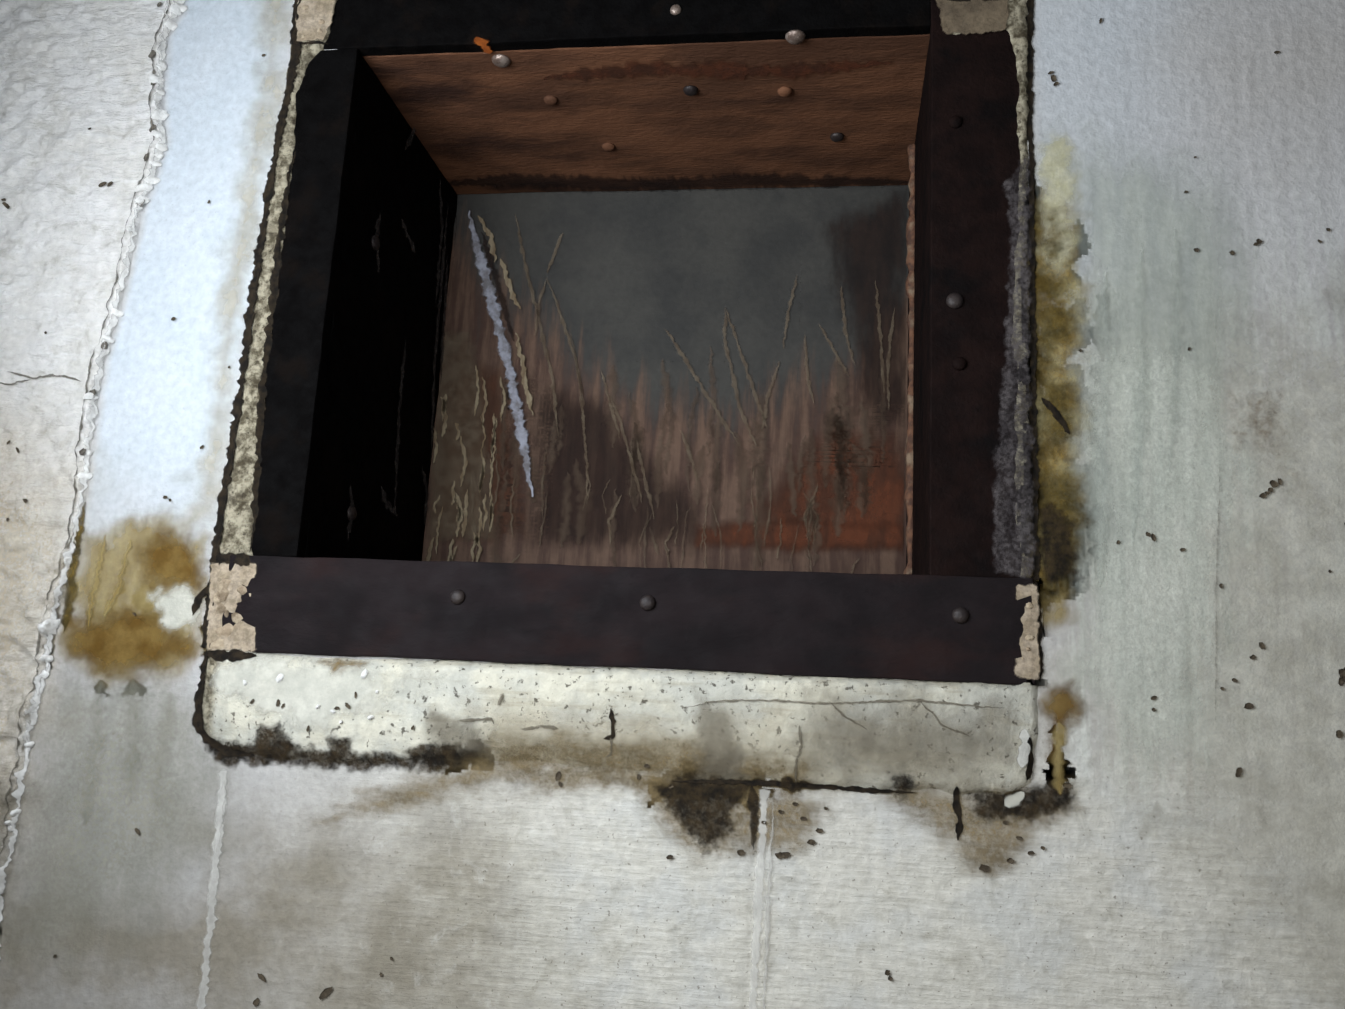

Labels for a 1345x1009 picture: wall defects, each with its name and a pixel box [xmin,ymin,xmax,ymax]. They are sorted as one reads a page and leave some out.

peeling [207,563,426,732]
leakage [208,706,828,859]
leakage [823,708,1073,872]
corrosion [1043,688,1082,794]